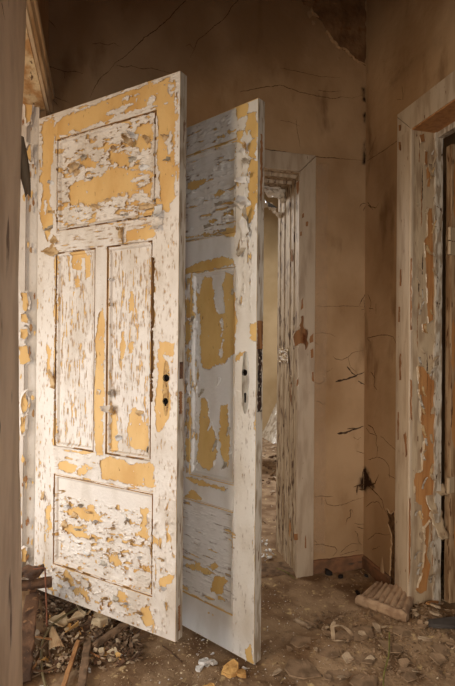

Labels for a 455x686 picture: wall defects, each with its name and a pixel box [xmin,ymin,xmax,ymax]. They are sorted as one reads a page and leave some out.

flaking render [302,0,367,66]
peeling [63,154,93,179]
peeling [41,225,59,256]
peeling [214,195,251,257]
peeling [18,291,36,365]
peeling [292,297,314,359]
peeling [399,134,455,594]
peeling [19,389,35,441]
peeling [179,388,205,414]
flaking render [354,468,379,493]
peeling [59,504,98,531]
peeling [65,604,92,633]